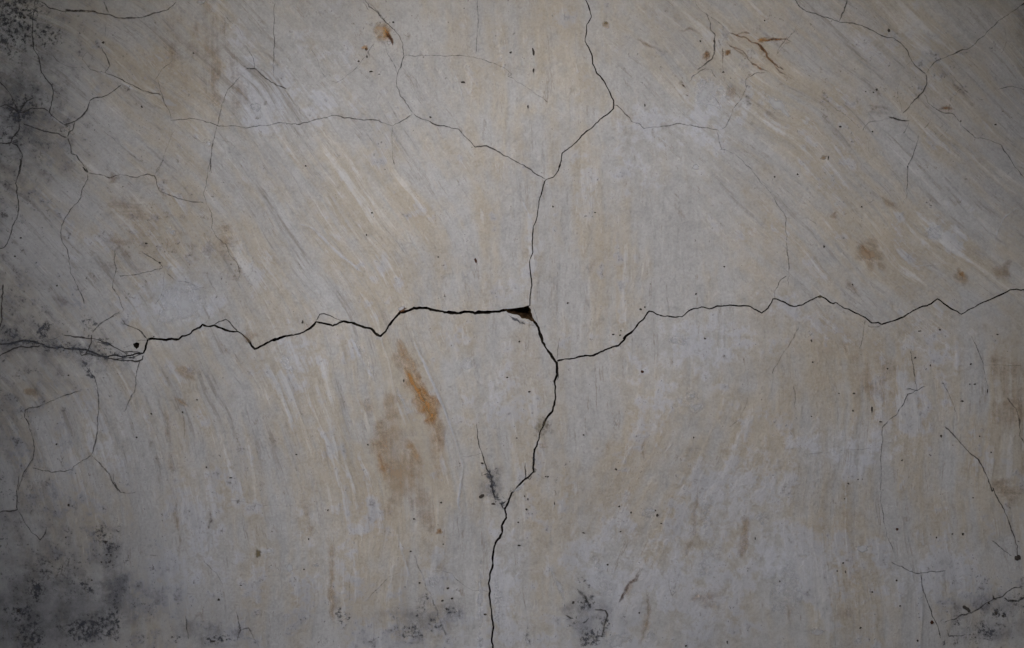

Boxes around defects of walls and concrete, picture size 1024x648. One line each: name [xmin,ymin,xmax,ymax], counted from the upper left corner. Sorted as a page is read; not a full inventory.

crack [0,0,729,306]
corrosion [722,32,783,73]
crack [795,0,1024,186]
crack [0,253,505,540]
crack [476,253,1024,648]
mould [57,596,120,642]